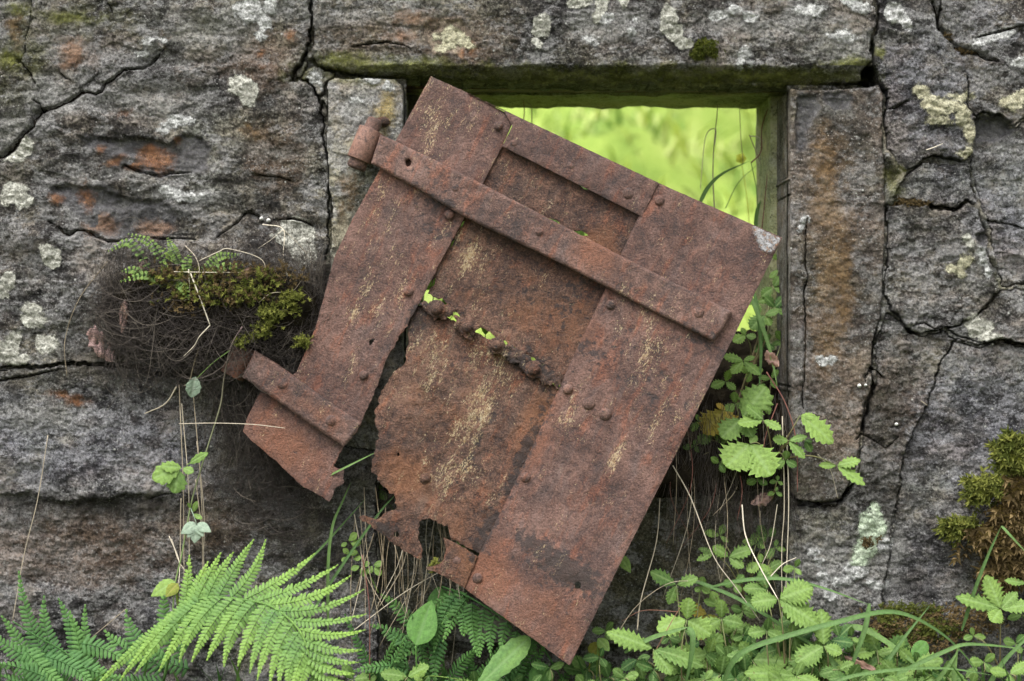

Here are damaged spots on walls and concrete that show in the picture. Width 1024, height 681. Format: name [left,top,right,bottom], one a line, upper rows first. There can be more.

crack [931,3,1023,62]
crack [0,54,160,159]
crack [52,212,309,242]
crack [800,220,808,409]
crack [913,322,1024,348]
crack [856,329,898,448]